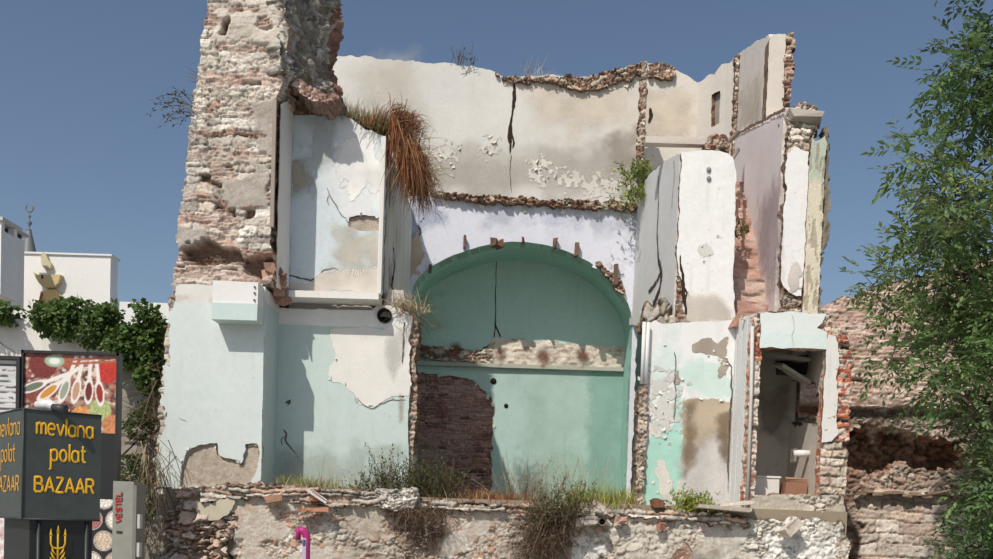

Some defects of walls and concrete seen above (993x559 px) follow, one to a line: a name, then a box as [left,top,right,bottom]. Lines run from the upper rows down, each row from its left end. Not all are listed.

peeling [334,130,388,201]
peeling [430,131,504,177]
crack [507,84,516,187]
spalling [432,153,638,218]
flaking render [346,212,387,237]
crack [483,262,501,348]
flaking render [692,337,729,378]
flaking render [328,325,625,498]
peeling [638,364,732,472]
flaking render [180,443,264,487]
peeling [649,459,674,509]
leakage [667,404,731,506]